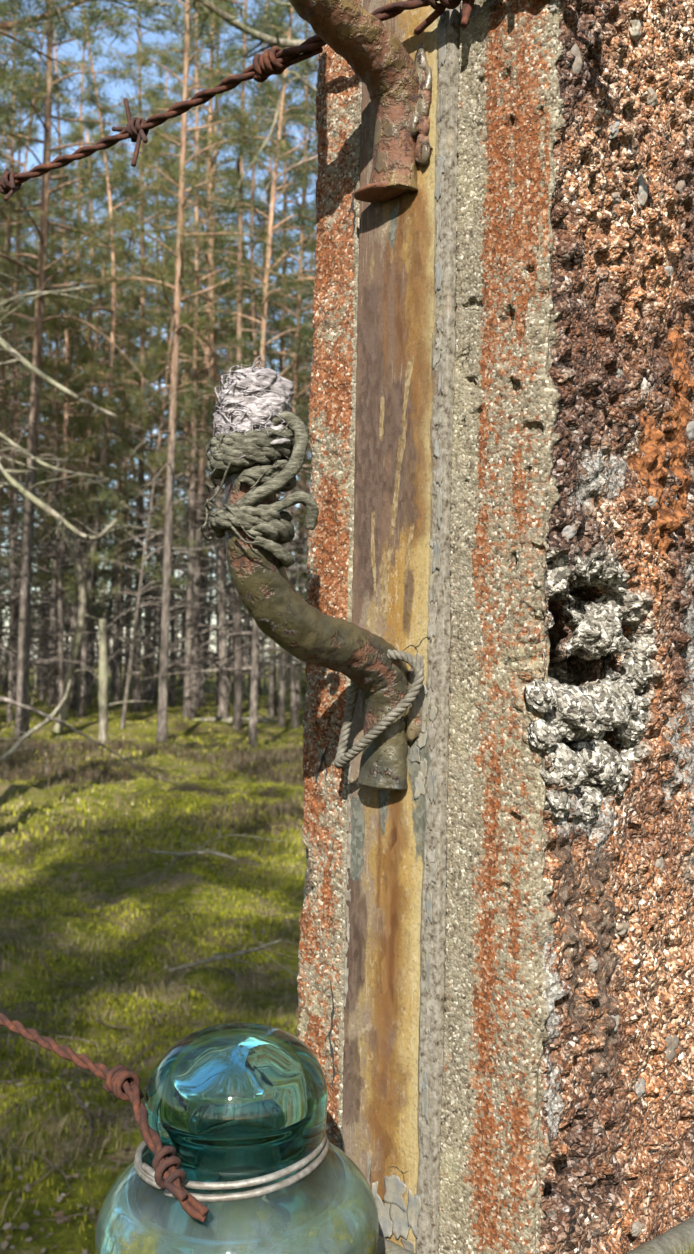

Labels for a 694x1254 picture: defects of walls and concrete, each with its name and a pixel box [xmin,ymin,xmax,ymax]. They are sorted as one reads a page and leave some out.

peeling [427,317,443,642]
rust [624,325,694,556]
spalling [506,538,667,823]
peeling [367,1152,429,1252]